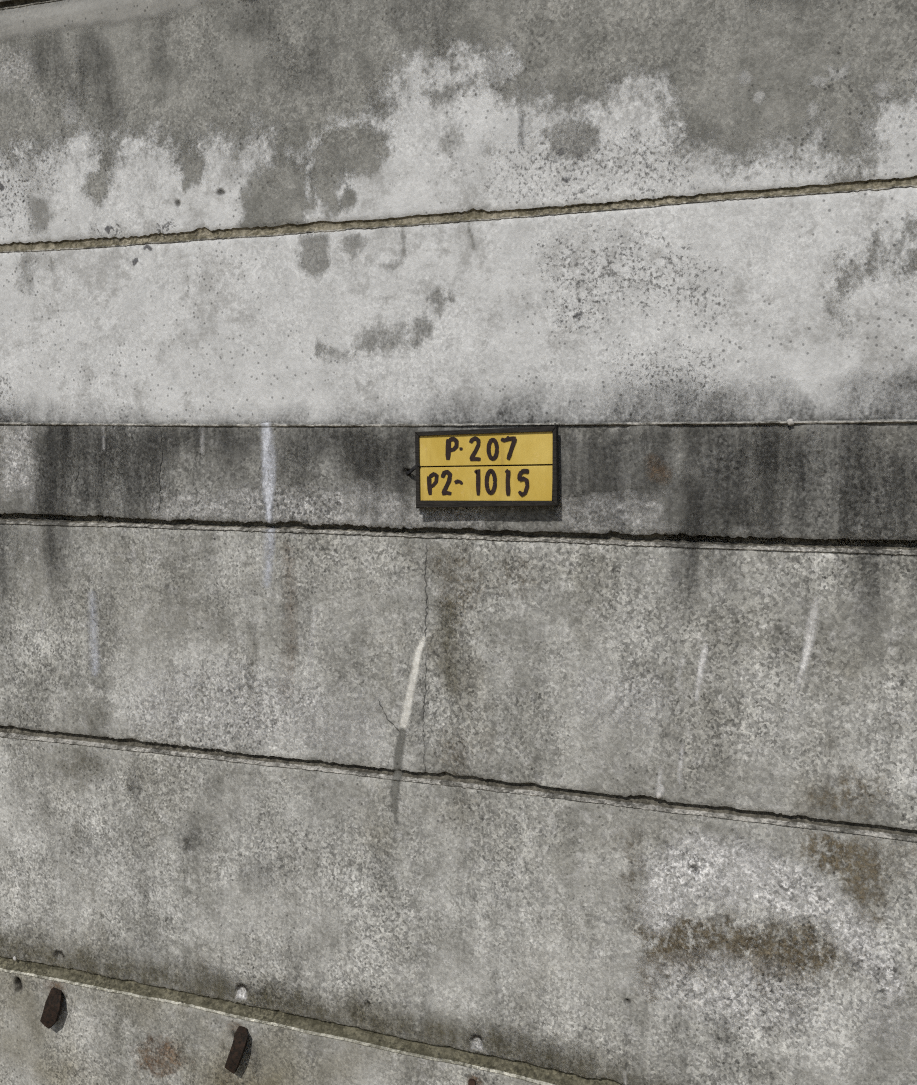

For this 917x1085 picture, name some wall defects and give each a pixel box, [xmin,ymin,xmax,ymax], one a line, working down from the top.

damp [41,426,156,566]
damp [262,422,275,586]
damp [681,441,749,579]
crack [379,548,428,771]
damp [641,917,847,998]